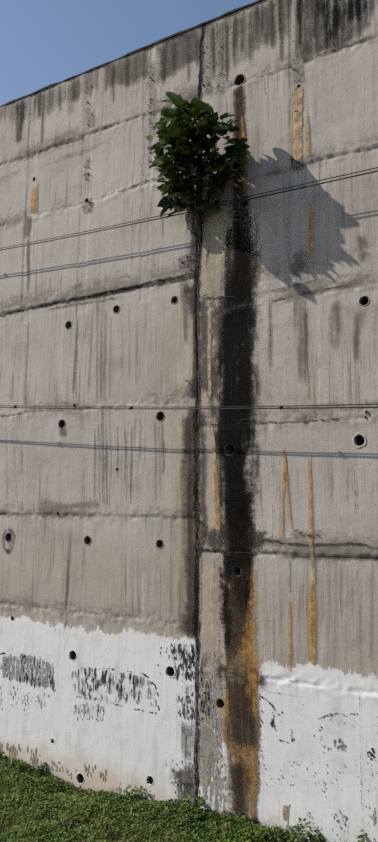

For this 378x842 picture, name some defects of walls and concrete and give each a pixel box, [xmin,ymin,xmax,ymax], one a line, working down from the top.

water stain [158,30,199,80]
crack [198,25,206,100]
water stain [295,0,373,60]
water stain [233,85,246,139]
rust [293,87,309,161]
crack [0,227,348,802]
water stain [184,158,267,830]
rust [281,448,292,536]
peeling [0,652,54,711]
peeling [71,667,159,722]
peeling [158,642,228,813]
water stain [177,765,198,804]